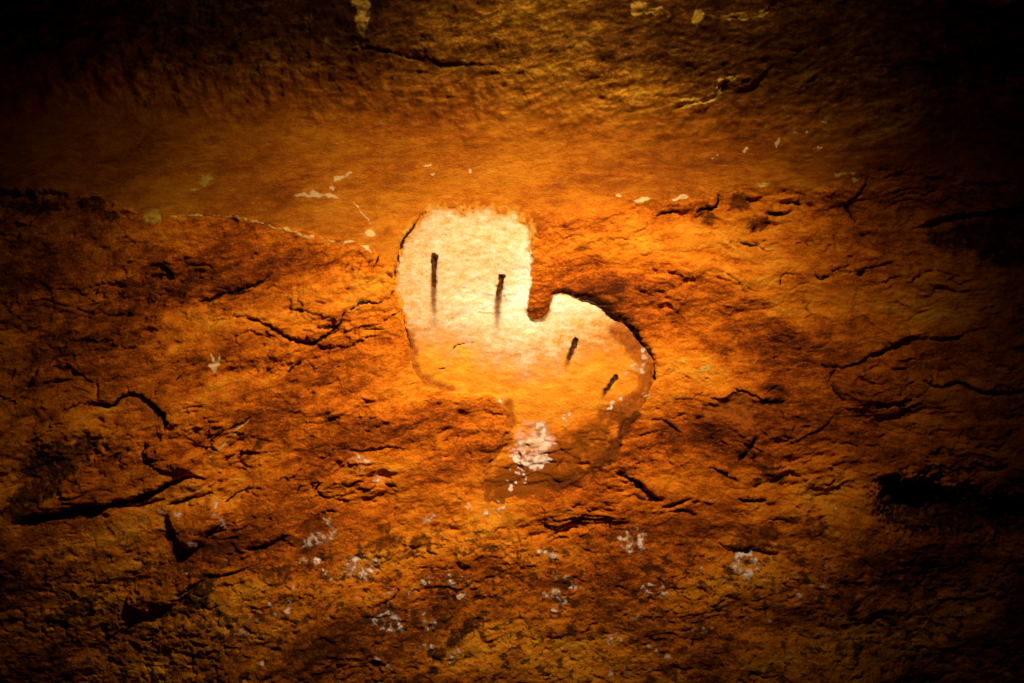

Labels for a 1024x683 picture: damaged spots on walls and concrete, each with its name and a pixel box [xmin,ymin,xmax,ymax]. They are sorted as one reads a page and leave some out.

crack [351,46,503,68]
crack [200,218,421,387]
spalling [394,202,655,504]
crack [66,386,168,461]
damp [506,422,555,491]
crack [23,476,259,519]